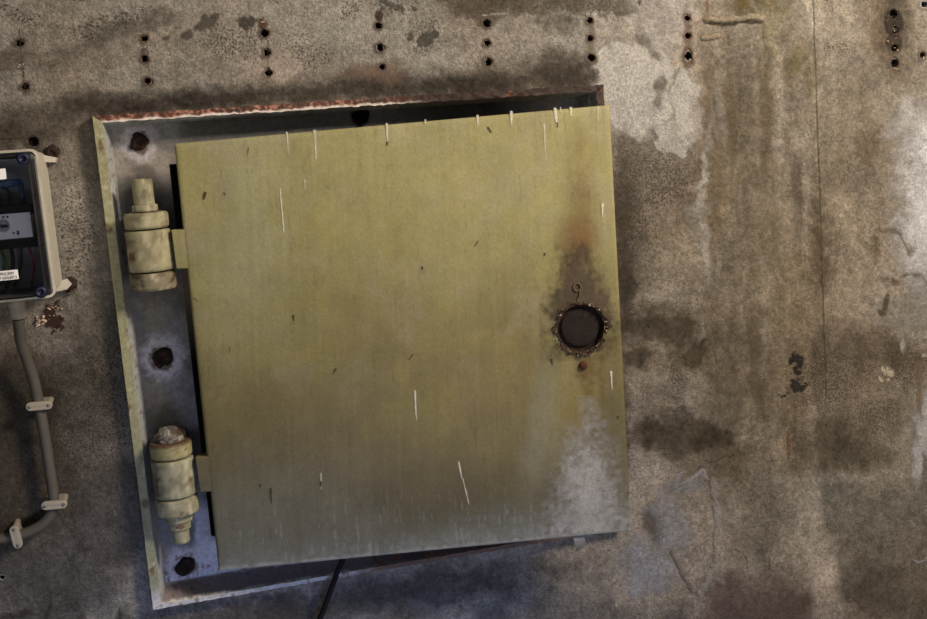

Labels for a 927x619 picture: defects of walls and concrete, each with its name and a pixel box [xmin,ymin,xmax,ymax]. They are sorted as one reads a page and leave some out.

leakage [463,0,758,268]
leakage [614,195,705,368]
leakage [551,440,627,533]